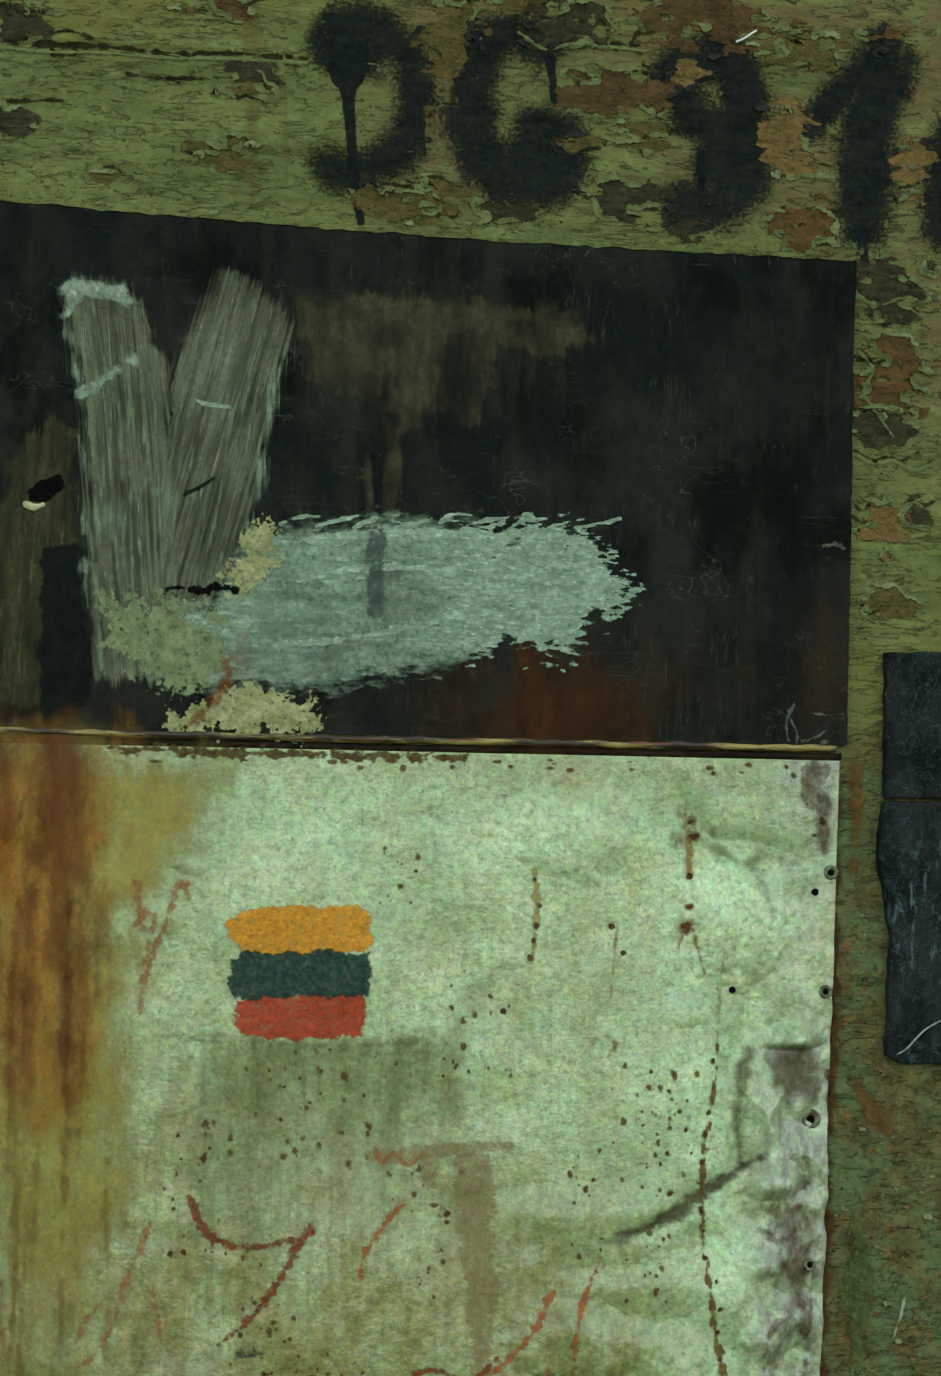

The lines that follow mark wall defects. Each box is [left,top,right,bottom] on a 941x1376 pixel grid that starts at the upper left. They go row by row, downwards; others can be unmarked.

peeling [0,0,68,48]
peeling [410,0,495,80]
peeling [209,53,300,103]
peeling [516,0,914,161]
peeling [0,99,42,137]
peeling [344,173,543,226]
peeling [573,174,715,244]
peeling [851,493,940,562]
corrosion [0,734,469,1316]
corrosion [734,1048,751,1164]
corrosion [621,1043,727,1376]
corrosion [238,1304,364,1376]